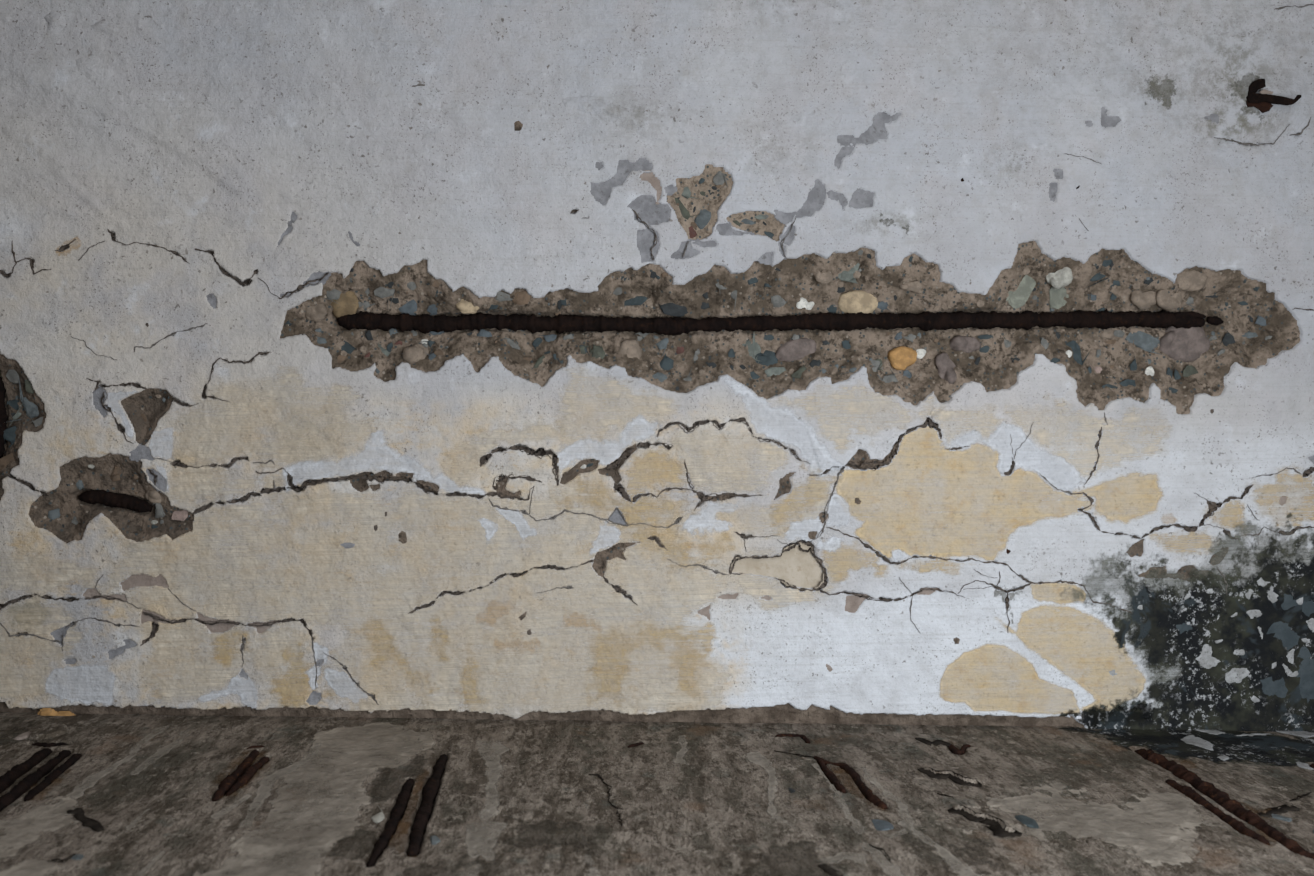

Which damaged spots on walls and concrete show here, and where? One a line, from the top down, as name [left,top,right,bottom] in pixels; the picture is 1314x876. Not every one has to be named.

peeling [834,112,901,169]
crack [0,229,328,299]
crack [632,209,689,260]
spalling [277,158,1300,500]
spalling [0,354,46,500]
crack [0,475,51,496]
spalling [29,386,194,543]
crack [72,323,1132,631]
crack [1004,412,1314,539]
crack [0,574,379,705]
damp [940,474,1314,766]